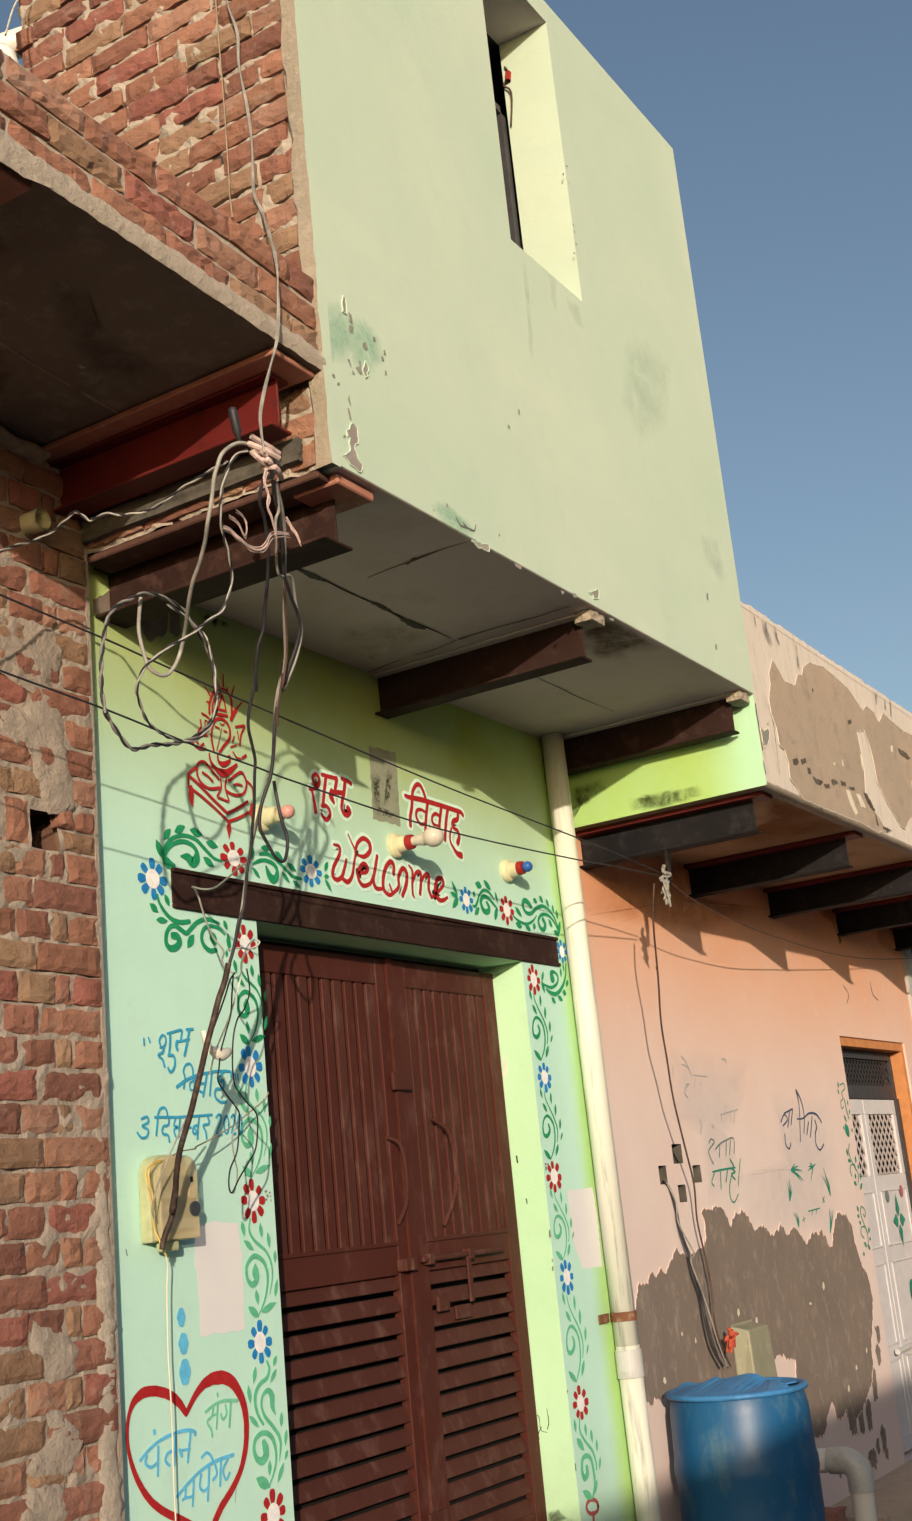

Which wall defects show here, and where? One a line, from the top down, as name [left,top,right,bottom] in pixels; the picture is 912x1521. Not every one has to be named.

peeling [332,295,387,473]
crack [298,517,570,672]
peeling [760,659,912,833]
peeling [635,1205,889,1470]